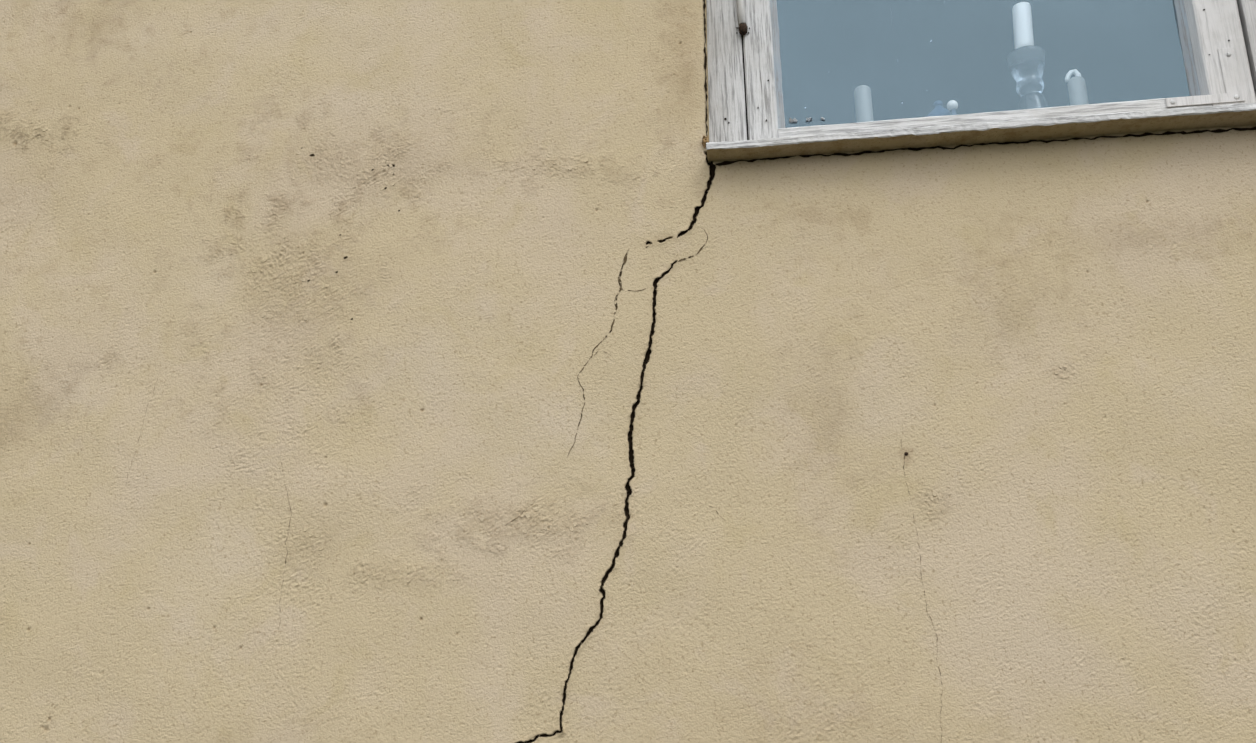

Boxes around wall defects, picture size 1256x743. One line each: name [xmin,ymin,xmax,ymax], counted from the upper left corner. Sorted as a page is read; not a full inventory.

crack [518,0,1256,743]